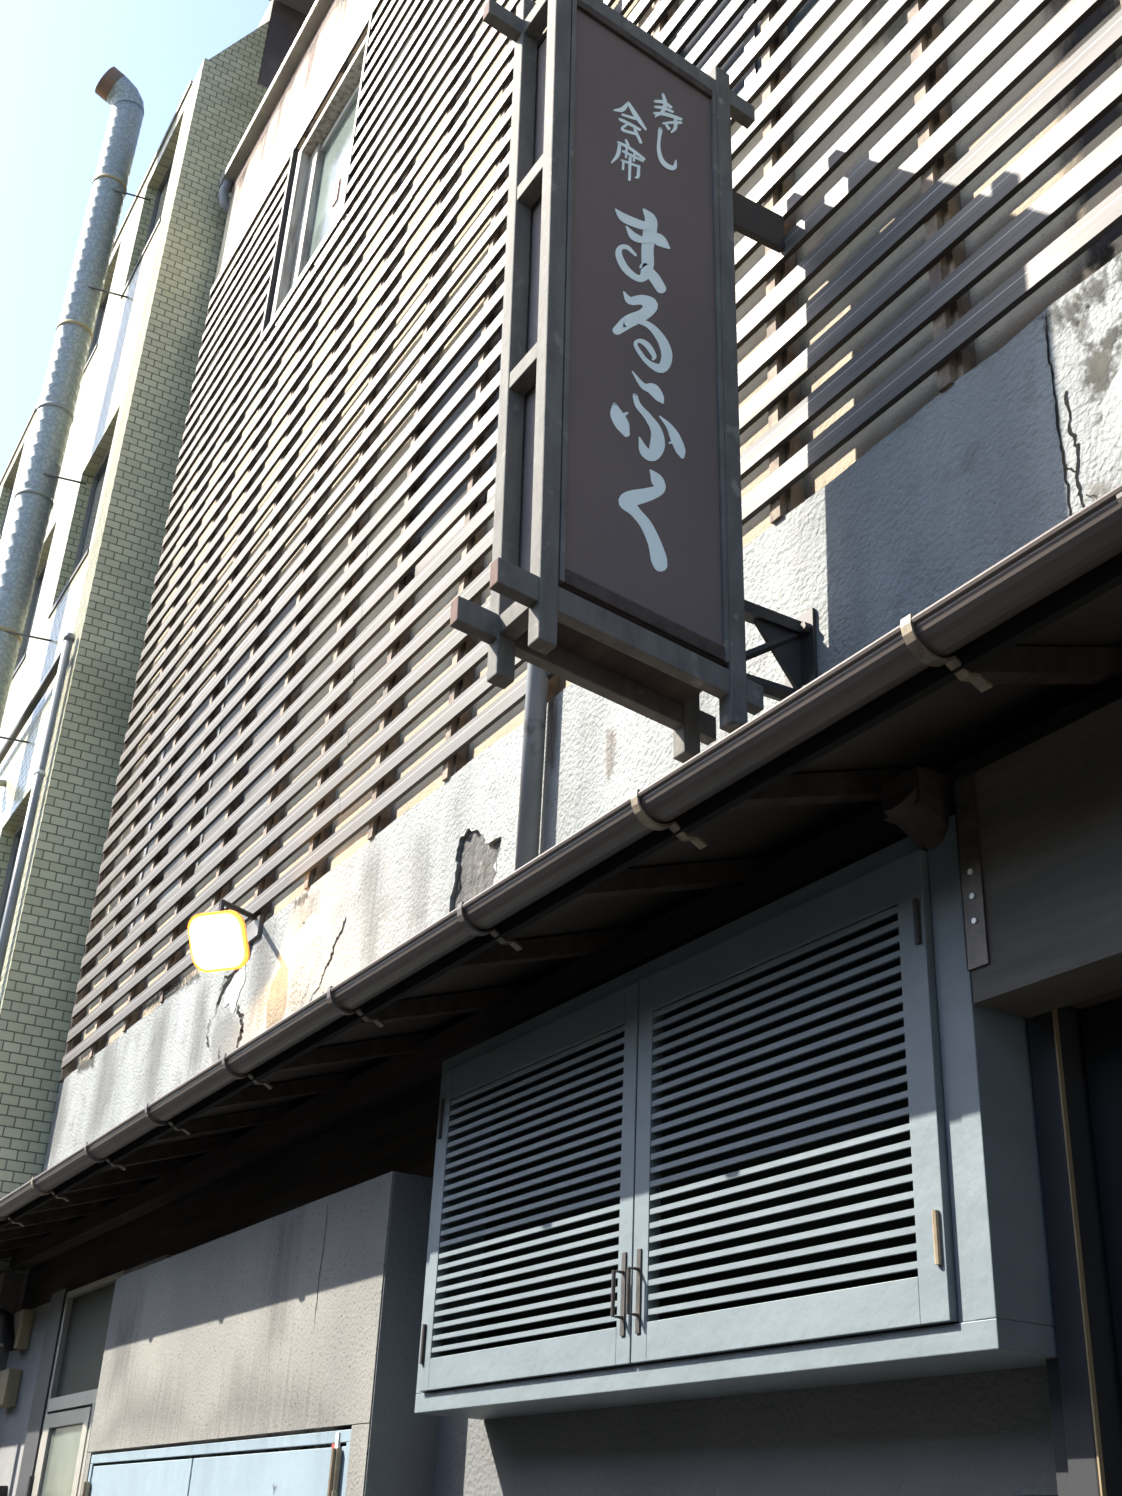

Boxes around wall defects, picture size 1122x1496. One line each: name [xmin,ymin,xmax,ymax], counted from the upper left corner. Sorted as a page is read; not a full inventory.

water stain [1061,0,1121,62]
water stain [1066,44,1122,114]
water stain [1074,102,1122,166]
water stain [1079,163,1122,216]
water stain [1041,222,1122,422]
crack [1045,316,1098,517]
spalling [452,828,501,909]
peeling [206,942,253,1060]